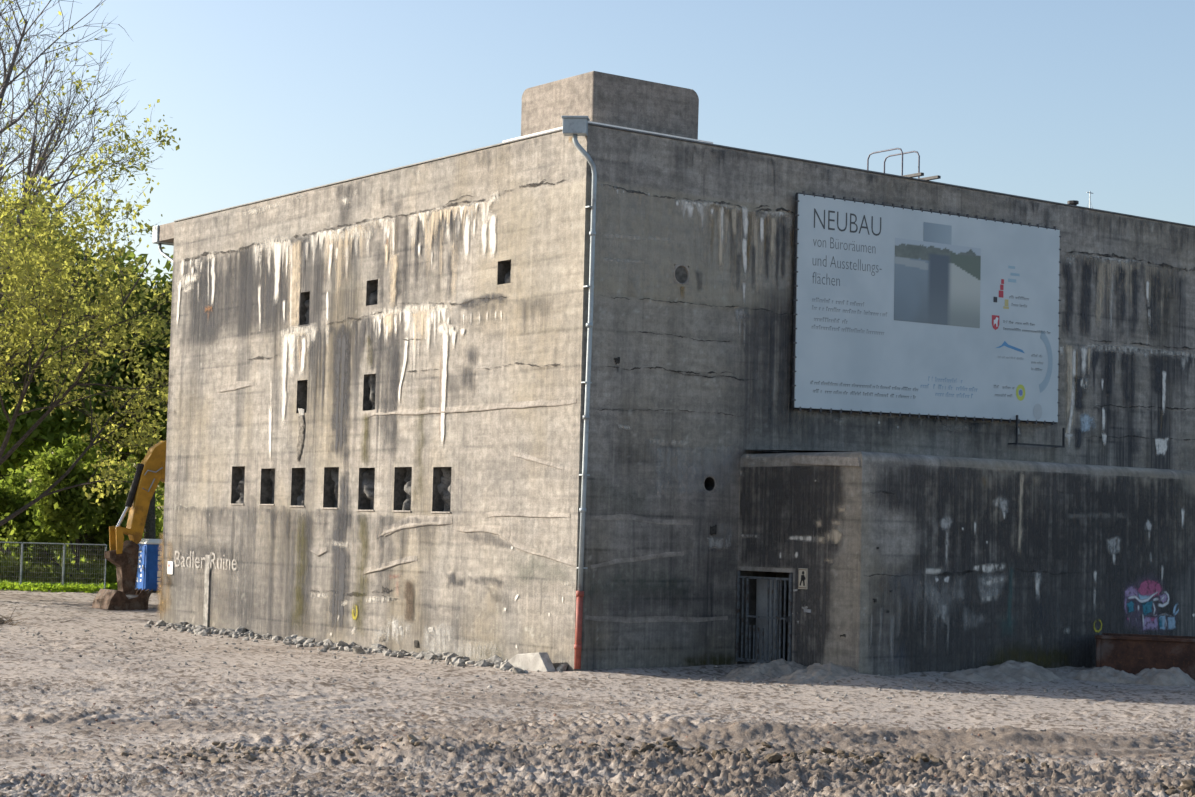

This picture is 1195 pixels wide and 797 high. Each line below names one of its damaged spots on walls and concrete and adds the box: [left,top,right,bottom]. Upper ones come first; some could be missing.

crack [183,179,564,261]
water stain [412,193,497,290]
crack [607,185,794,214]
crack [606,366,744,381]
crack [614,297,787,315]
water stain [676,200,794,425]
water stain [1060,256,1195,448]
water stain [177,219,503,635]
water stain [1155,438,1168,454]